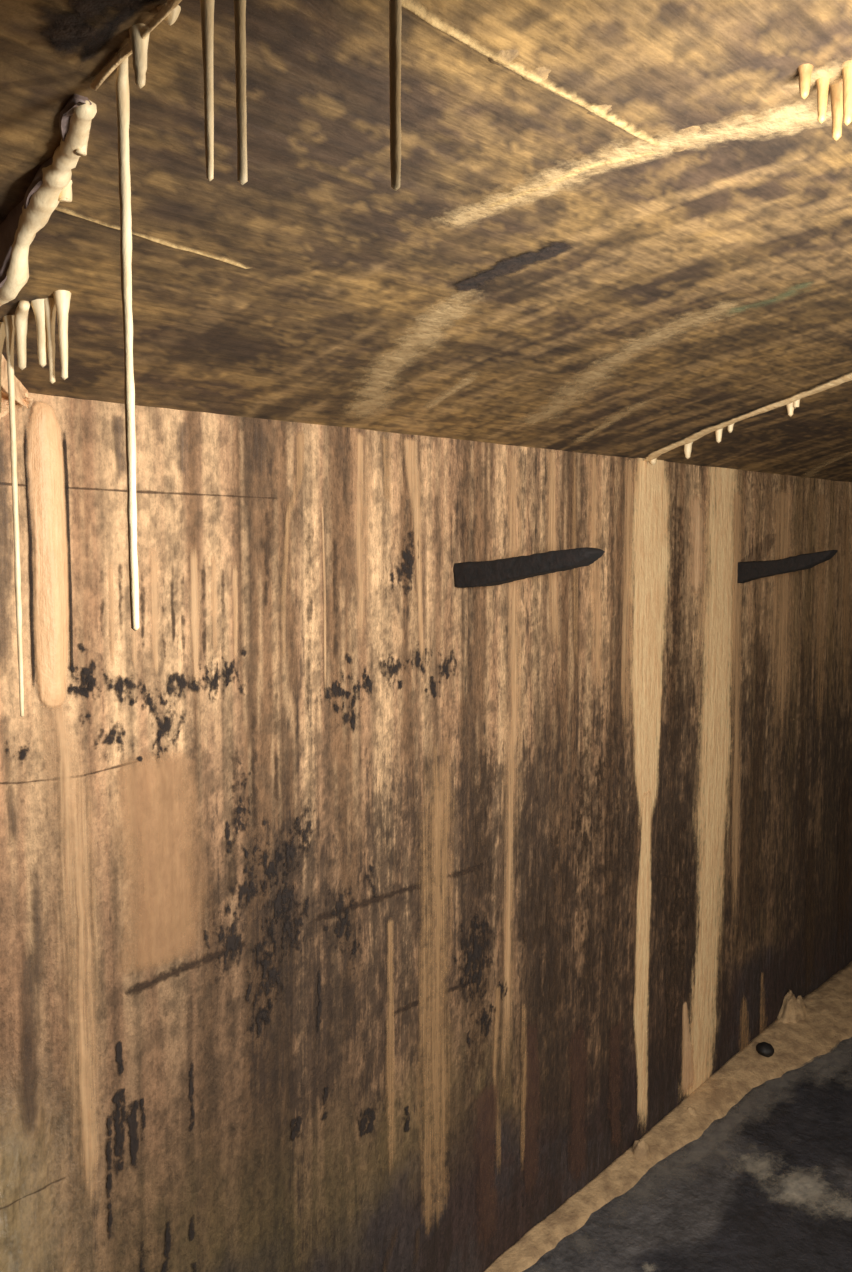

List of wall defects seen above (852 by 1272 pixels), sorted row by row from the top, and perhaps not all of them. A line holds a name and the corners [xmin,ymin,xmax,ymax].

crack [389,0,402,191]
water stain [445,105,832,226]
water stain [25,433,35,686]
crack [0,0,248,717]
water stain [64,434,246,761]
water stain [307,434,457,732]
water stain [348,242,572,416]
crack [643,373,852,465]
water stain [54,709,146,1239]
water stain [204,753,315,1036]
water stain [357,922,410,1158]
water stain [416,451,792,1260]